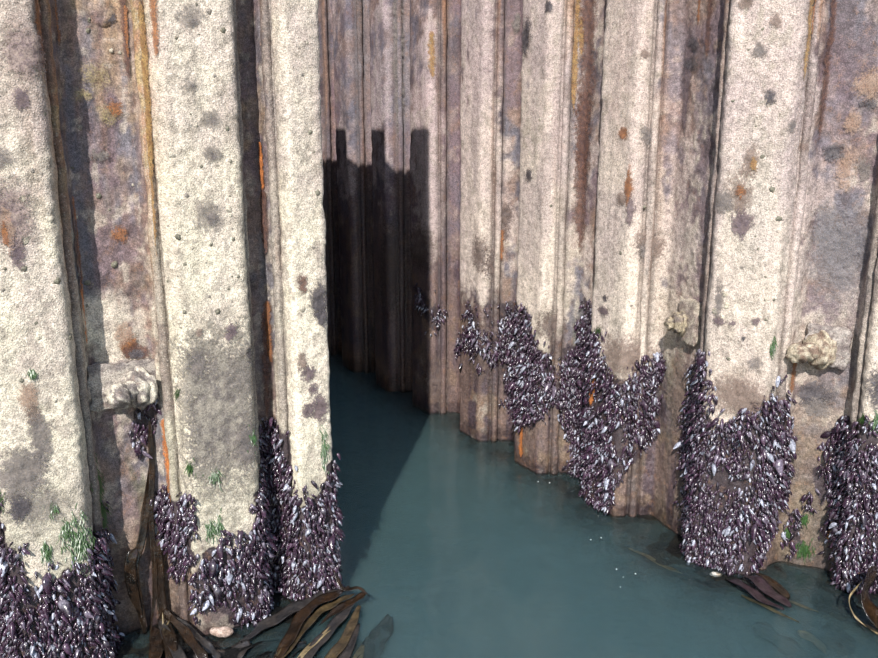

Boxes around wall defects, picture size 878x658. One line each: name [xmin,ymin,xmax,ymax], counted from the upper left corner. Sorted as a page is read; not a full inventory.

corrosion [804,0,817,79]
corrosion [819,0,837,139]
corrosion [118,0,159,254]
corrosion [258,142,269,253]
corrosion [571,0,598,253]
corrosion [617,164,636,225]
damp [822,143,845,162]
damp [809,203,869,291]
corrosion [261,301,273,414]
damp [865,363,878,409]
damp [0,410,71,533]
corrosion [160,419,171,502]